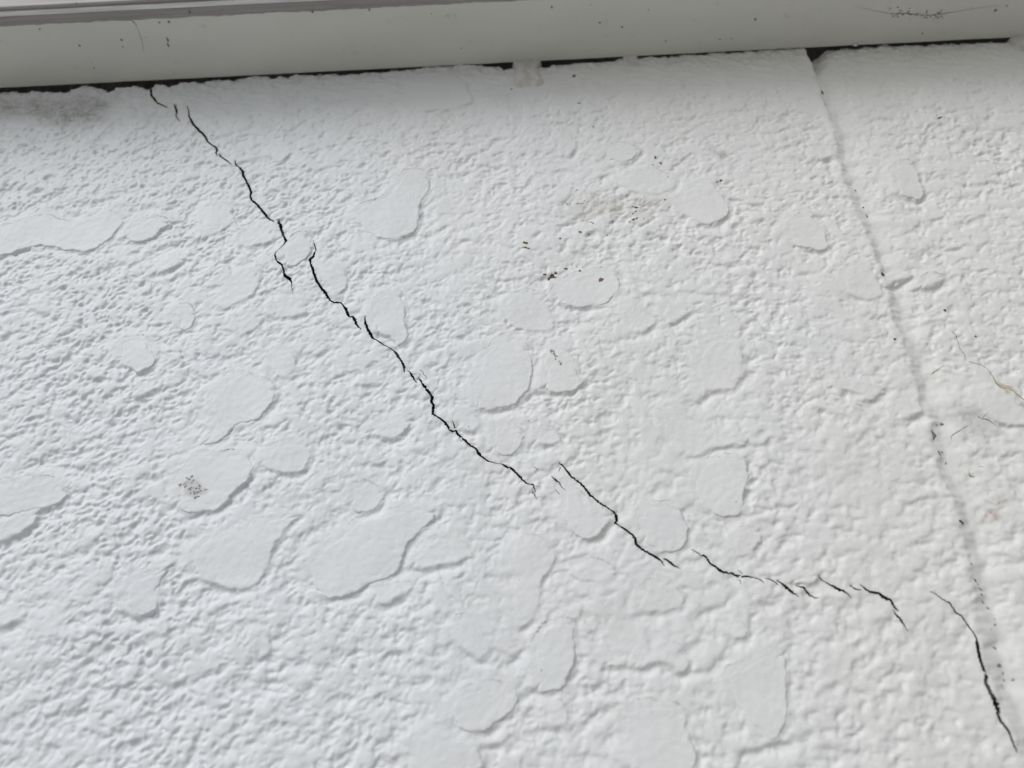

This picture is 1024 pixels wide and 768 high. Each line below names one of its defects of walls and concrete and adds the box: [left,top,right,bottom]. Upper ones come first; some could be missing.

crack [146,88,909,631]
crack [930,591,1018,753]